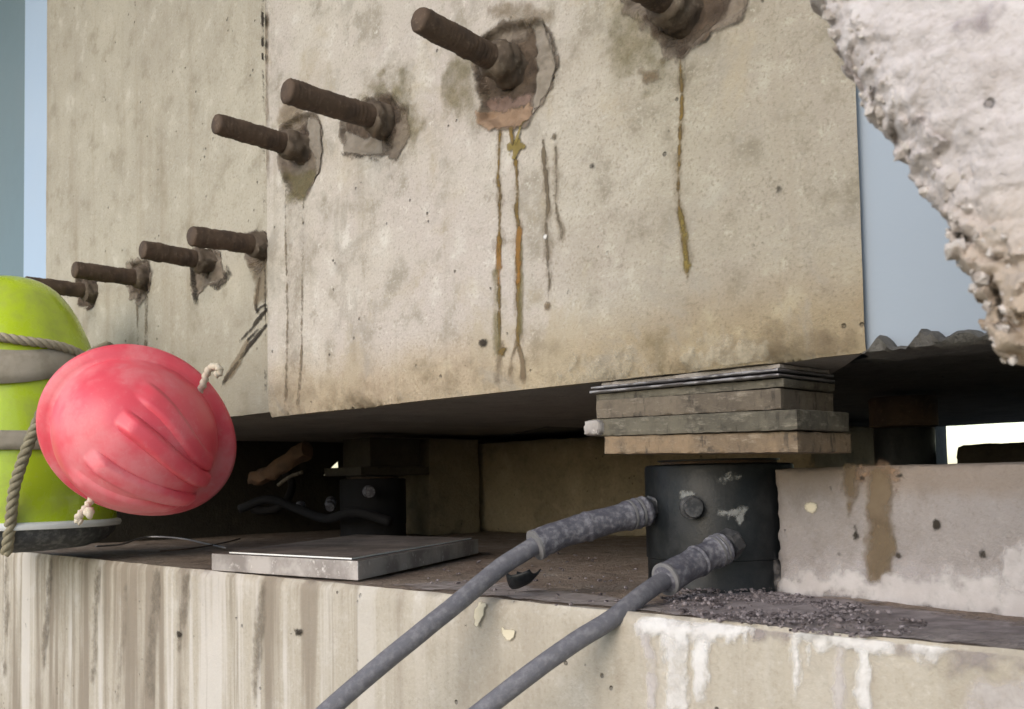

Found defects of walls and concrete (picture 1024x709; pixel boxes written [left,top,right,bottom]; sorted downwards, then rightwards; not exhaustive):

crack [260,0,268,103]
spalling [277,104,323,201]
spalling [338,73,416,161]
spalling [447,4,559,131]
spalling [620,0,748,82]
rust [677,57,691,273]
rust [493,121,526,380]
crack [222,269,267,385]
damp [778,464,1024,617]
damp [636,617,765,709]
damp [784,633,945,709]